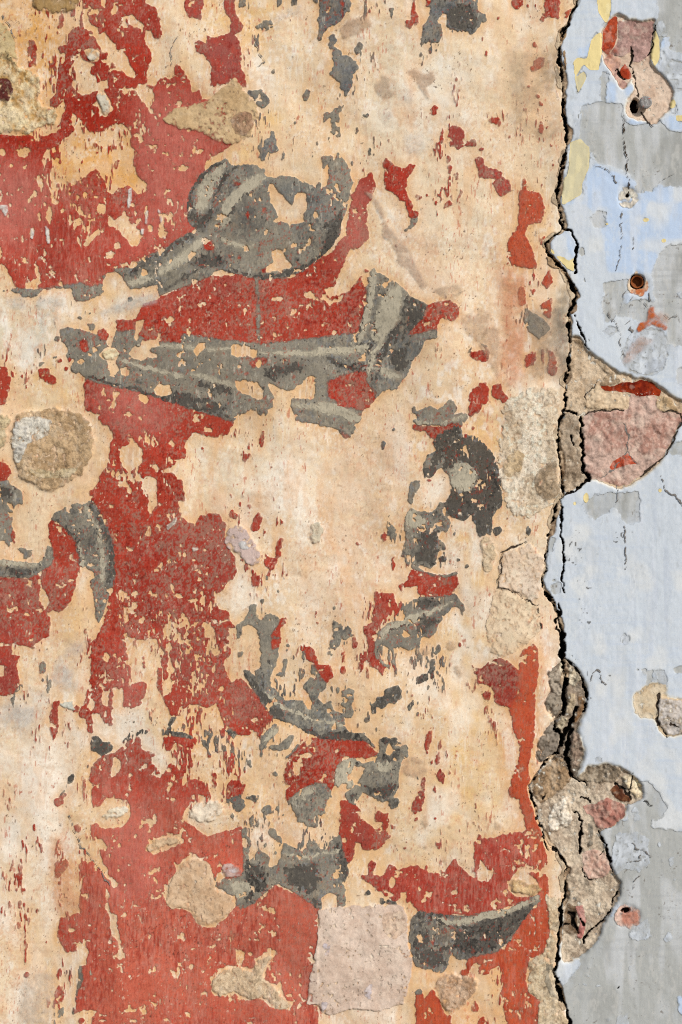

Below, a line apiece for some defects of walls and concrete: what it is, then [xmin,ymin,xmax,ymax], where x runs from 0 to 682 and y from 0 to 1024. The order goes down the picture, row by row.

peeling [0,0,259,289]
peeling [97,116,553,359]
peeling [0,349,73,405]
peeling [79,338,89,353]
peeling [244,357,268,376]
peeling [327,370,377,411]
peeling [361,0,682,1024]
crack [497,0,682,1024]
peeling [296,556,459,683]
peeling [0,379,320,1024]
peeling [274,737,378,801]
peeling [339,800,393,863]